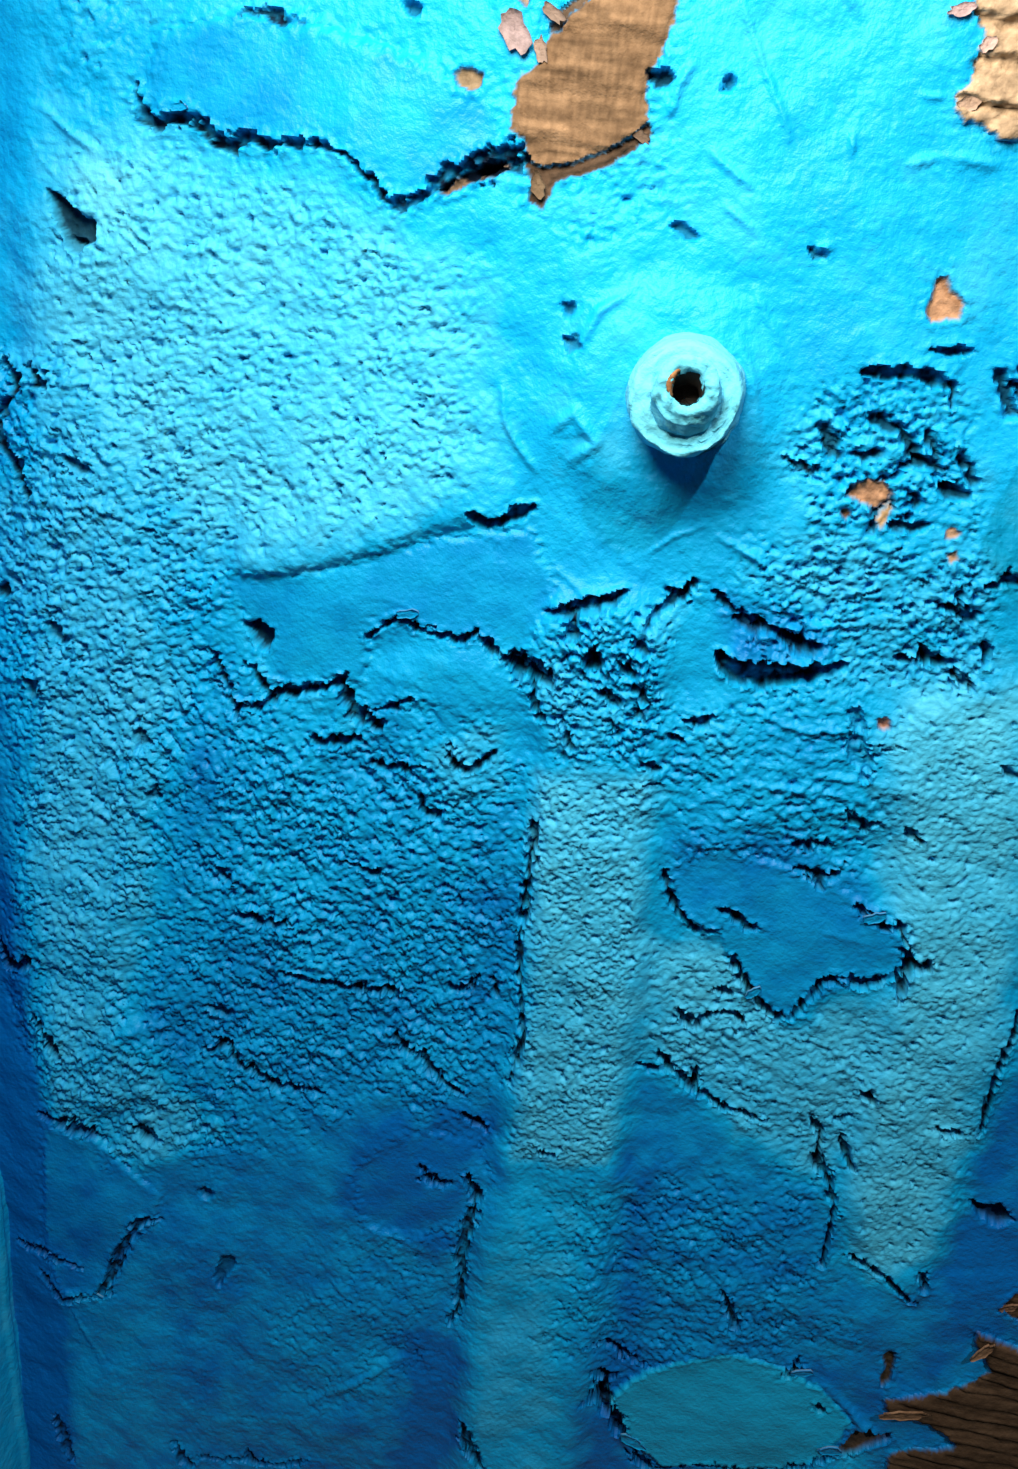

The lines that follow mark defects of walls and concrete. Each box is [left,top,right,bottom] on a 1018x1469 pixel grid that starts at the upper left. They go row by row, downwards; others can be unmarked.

crack [131,80,531,216]
spalling [438,0,682,212]
spalling [947,0,1018,143]
peeling [926,275,966,325]
crack [859,343,977,414]
crack [780,453,822,477]
crack [892,566,1018,693]
crack [200,577,936,1131]
crack [929,1009,1018,1140]
crack [808,1089,930,1306]
spalling [998,1294,1018,1321]
peeling [611,1330,1018,1469]